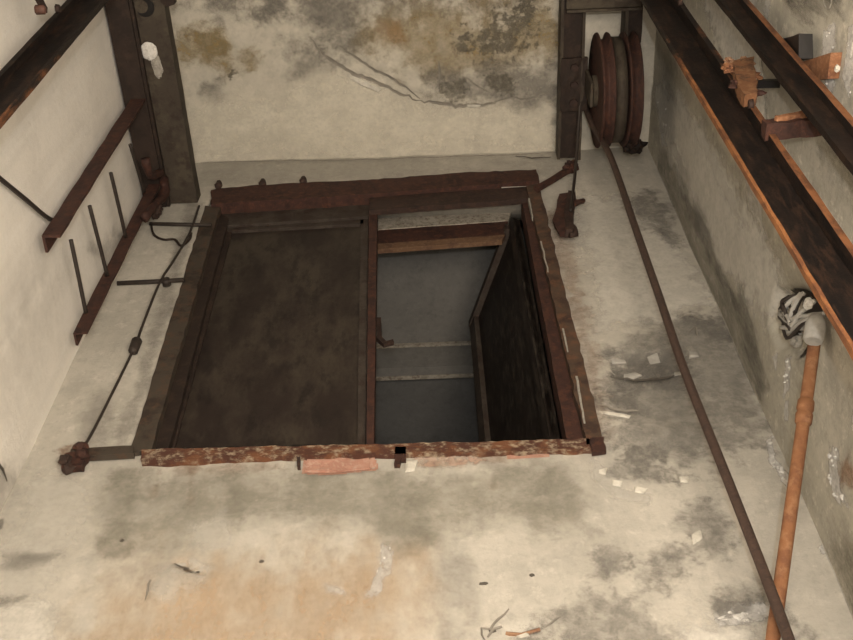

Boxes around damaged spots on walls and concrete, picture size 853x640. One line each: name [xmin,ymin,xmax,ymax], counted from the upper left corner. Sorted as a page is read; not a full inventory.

damp [291,0,369,50]
crack [310,38,545,109]
damp [428,0,556,107]